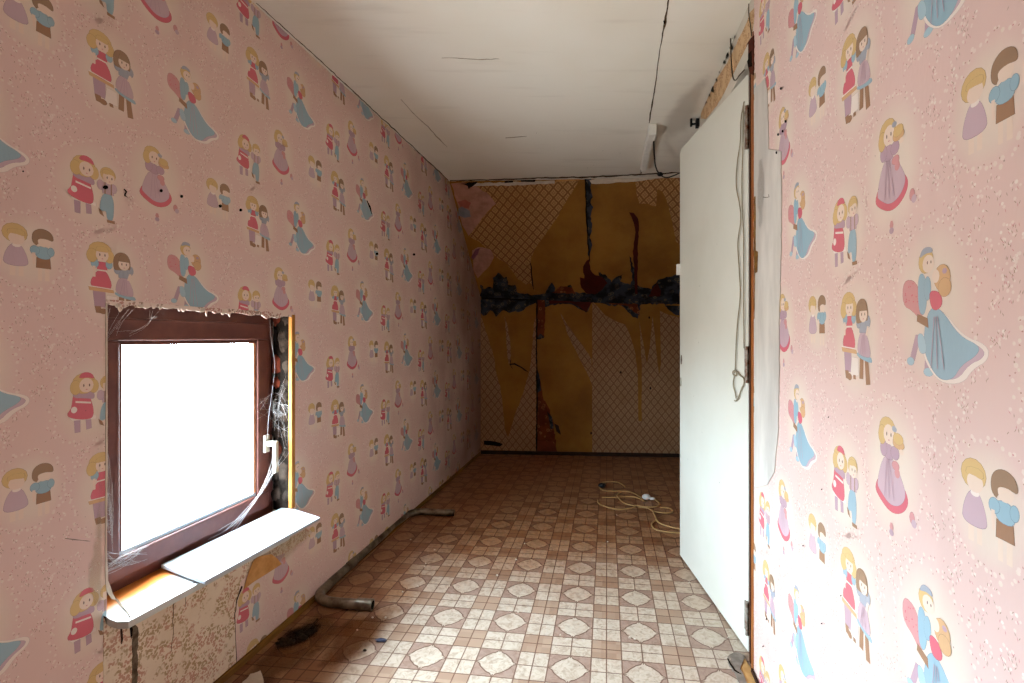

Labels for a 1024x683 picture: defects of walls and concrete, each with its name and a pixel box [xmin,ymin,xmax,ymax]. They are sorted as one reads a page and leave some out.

crack [256,0,679,261]
peeling [474,178,657,186]
peeling [115,303,162,312]